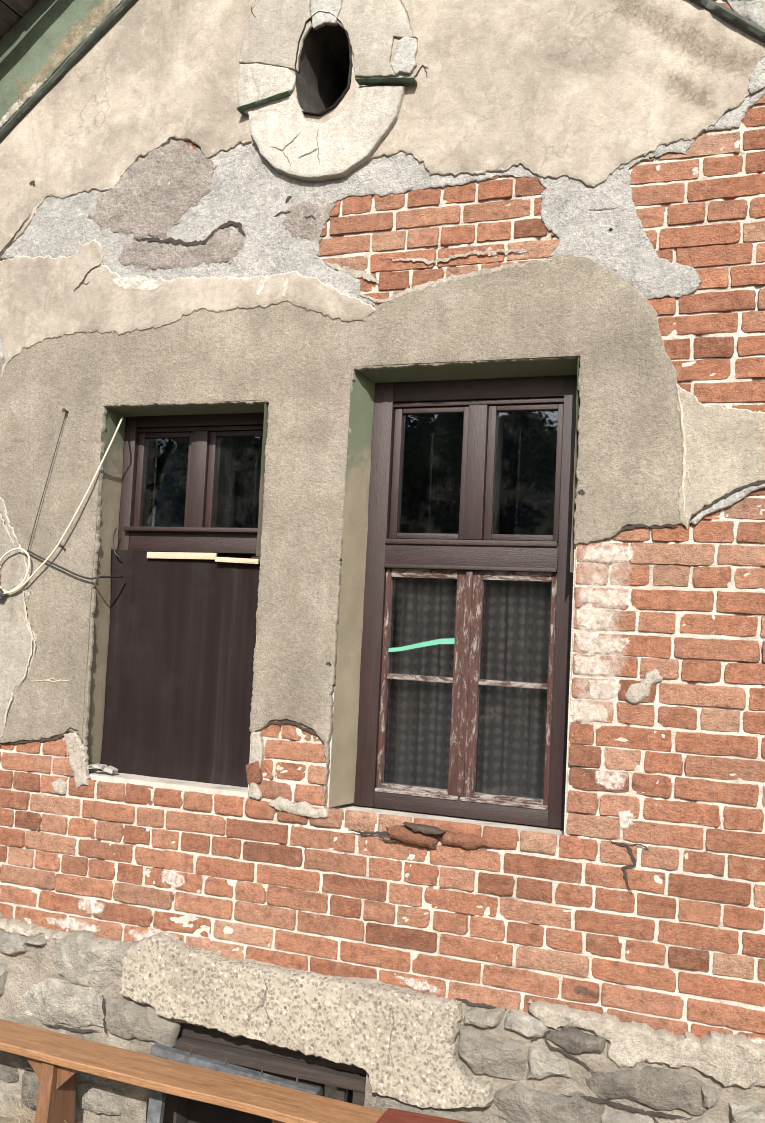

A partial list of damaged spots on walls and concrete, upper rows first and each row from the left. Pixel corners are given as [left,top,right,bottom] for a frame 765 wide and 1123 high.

flaking render [723,0,765,29]
flaking render [0,57,765,307]